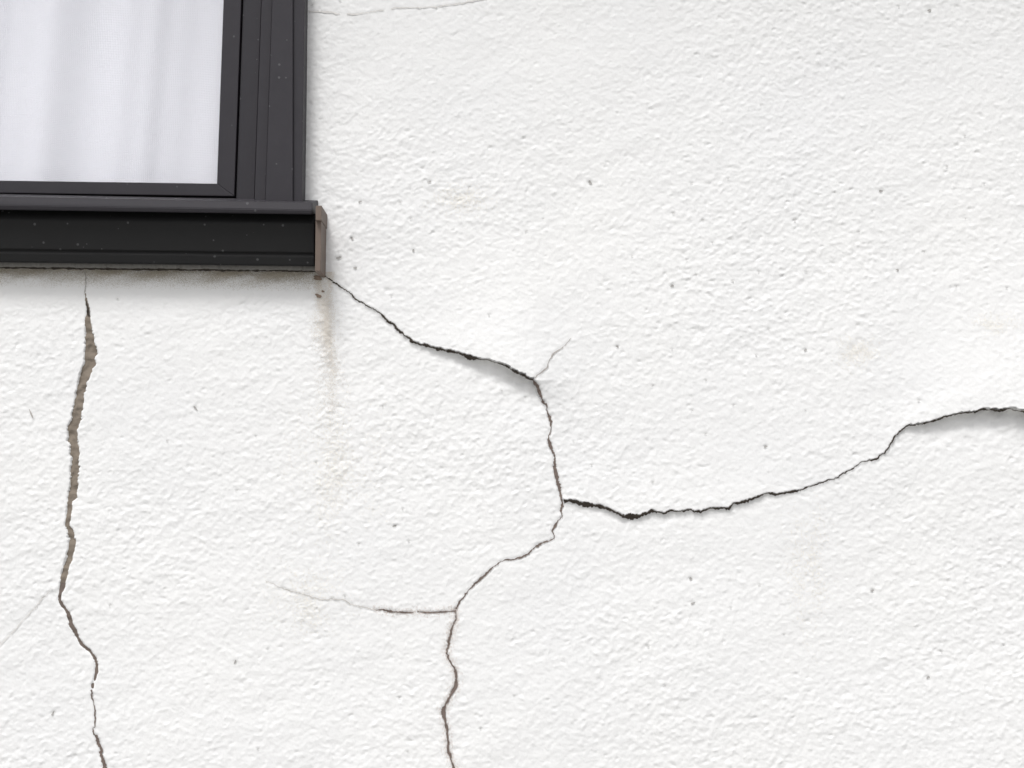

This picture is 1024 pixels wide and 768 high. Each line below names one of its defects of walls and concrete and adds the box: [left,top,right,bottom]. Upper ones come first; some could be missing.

crack [0,272,107,768]
crack [266,277,1024,768]